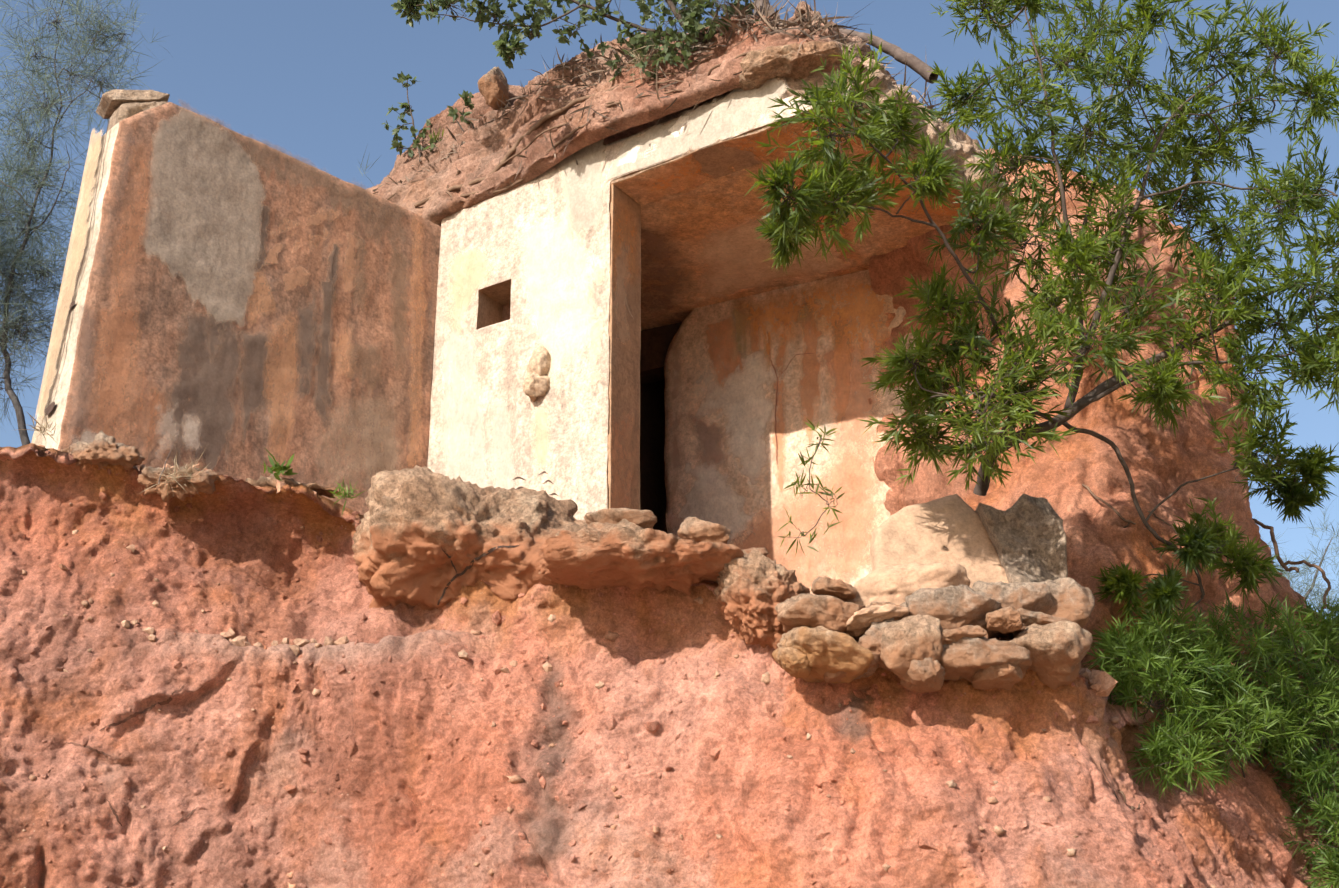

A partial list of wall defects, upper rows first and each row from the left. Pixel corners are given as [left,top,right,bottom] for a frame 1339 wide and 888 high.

damp [167,313,272,470]
peeling [107,101,340,327]
damp [208,119,407,482]
peeling [678,341,877,588]